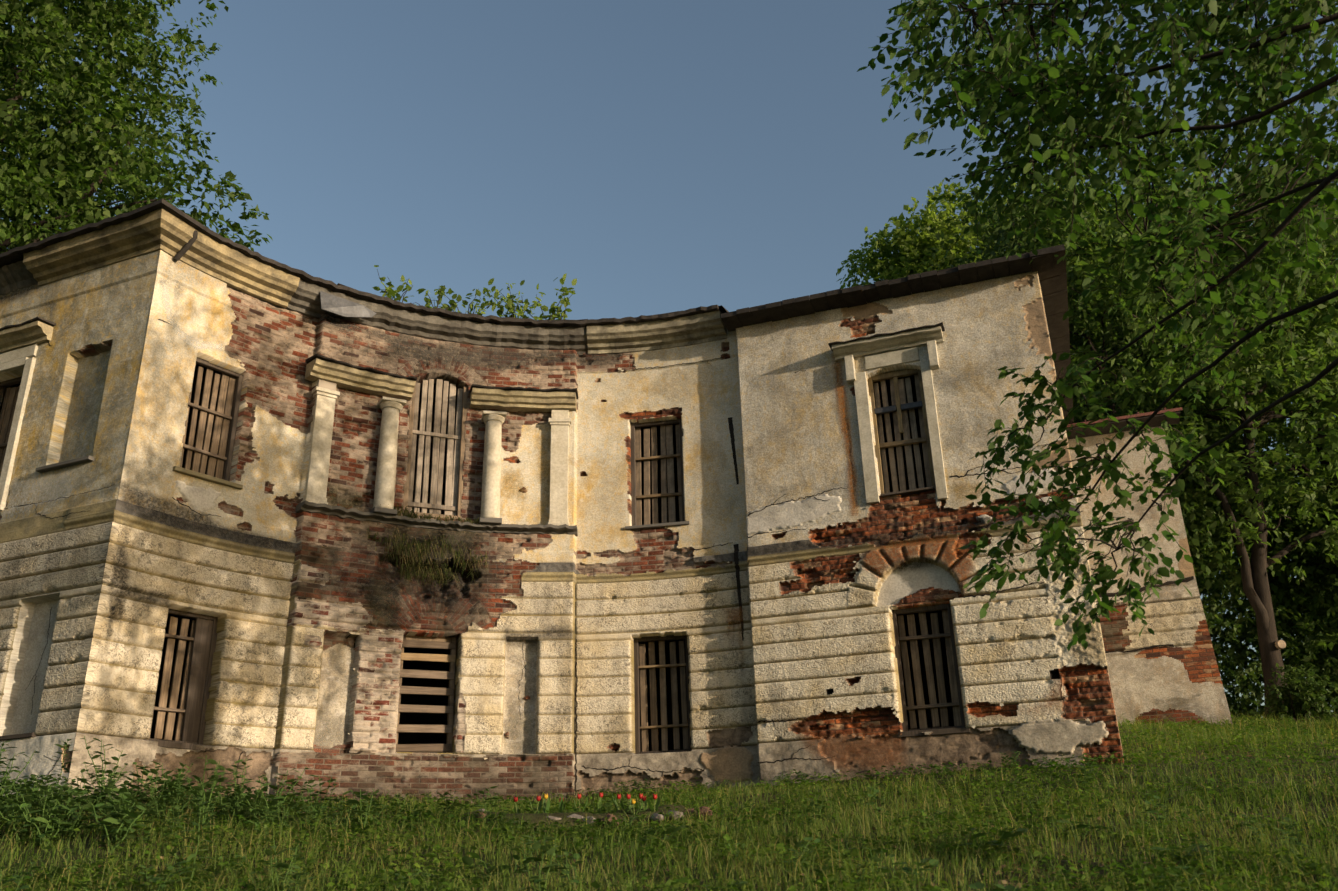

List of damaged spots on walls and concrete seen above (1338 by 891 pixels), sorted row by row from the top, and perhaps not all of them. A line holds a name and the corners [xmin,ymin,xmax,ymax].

peeling [838,302,893,338]
peeling [1014,275,1056,383]
spalling [175,285,636,562]
spalling [619,407,682,422]
spalling [574,436,733,577]
crack [693,417,847,641]
rust [834,357,856,514]
spalling [779,437,1075,596]
spalling [287,564,405,756]
spalling [453,693,467,753]
peeling [788,676,1036,780]
spalling [1049,602,1222,766]